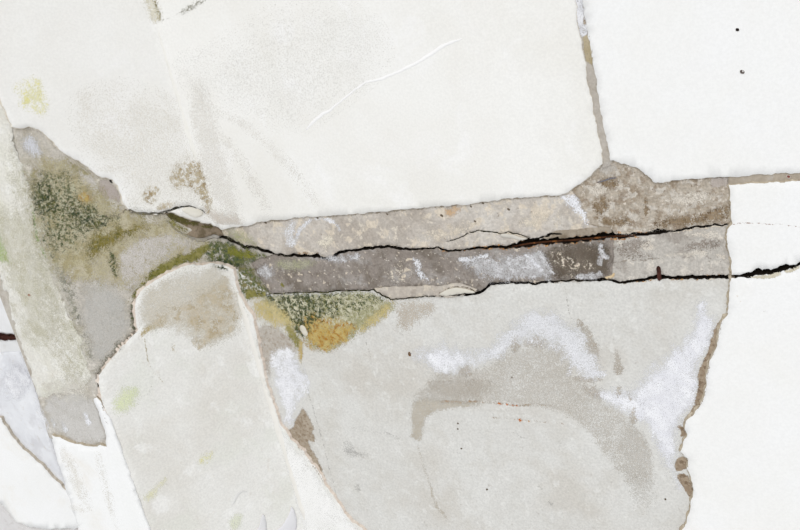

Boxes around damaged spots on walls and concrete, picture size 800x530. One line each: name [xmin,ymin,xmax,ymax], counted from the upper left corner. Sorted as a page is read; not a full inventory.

spalling [13,127,125,223]
spalling [727,173,800,184]
crack [83,205,205,221]
leakage [55,233,245,367]
leakage [257,217,360,280]
spalling [37,59,731,530]
crack [201,222,796,260]
crack [256,262,800,301]
leakage [458,237,650,284]
leakage [409,299,719,519]
spalling [0,503,78,530]